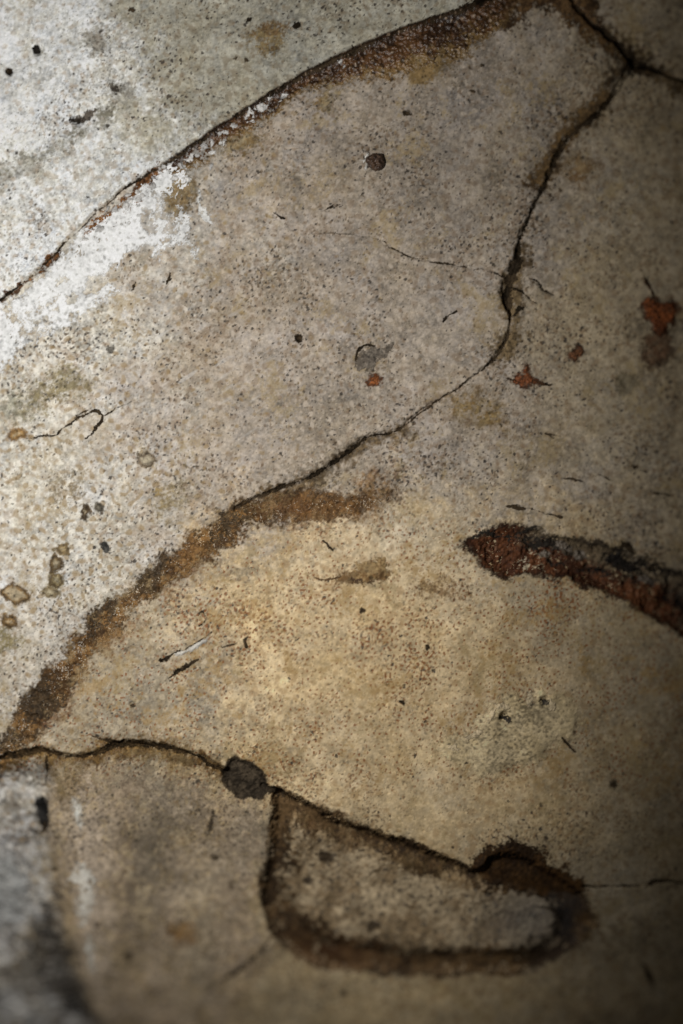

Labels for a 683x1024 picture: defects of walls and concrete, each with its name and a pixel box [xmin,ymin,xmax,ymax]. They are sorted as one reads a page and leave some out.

crack [0,0,491,302]
efflorescence [0,153,212,373]
crack [236,0,683,509]
rust [640,270,682,370]
rust [567,344,584,362]
rust [507,365,552,389]
crack [33,407,119,439]
crack [506,504,563,519]
crack [0,736,228,784]
crack [267,786,285,798]
crack [206,811,214,836]
crack [582,879,683,888]